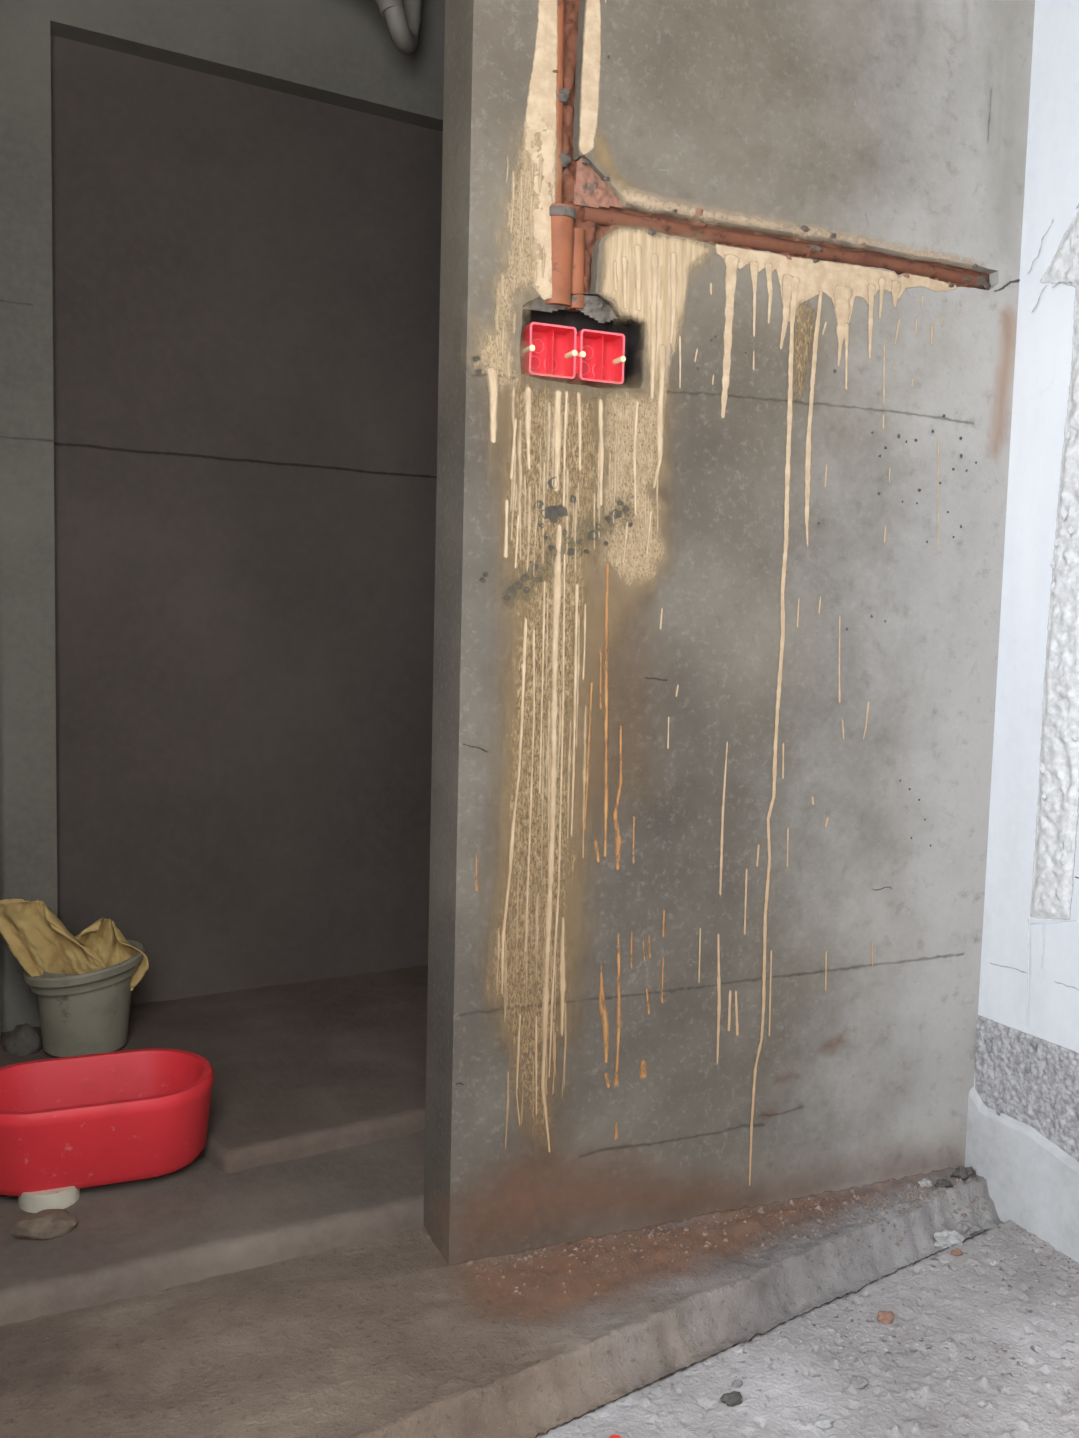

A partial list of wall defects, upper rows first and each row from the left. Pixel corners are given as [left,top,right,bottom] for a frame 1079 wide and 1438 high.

crack [994,279,1020,292]
corrosion [474,1198,838,1313]